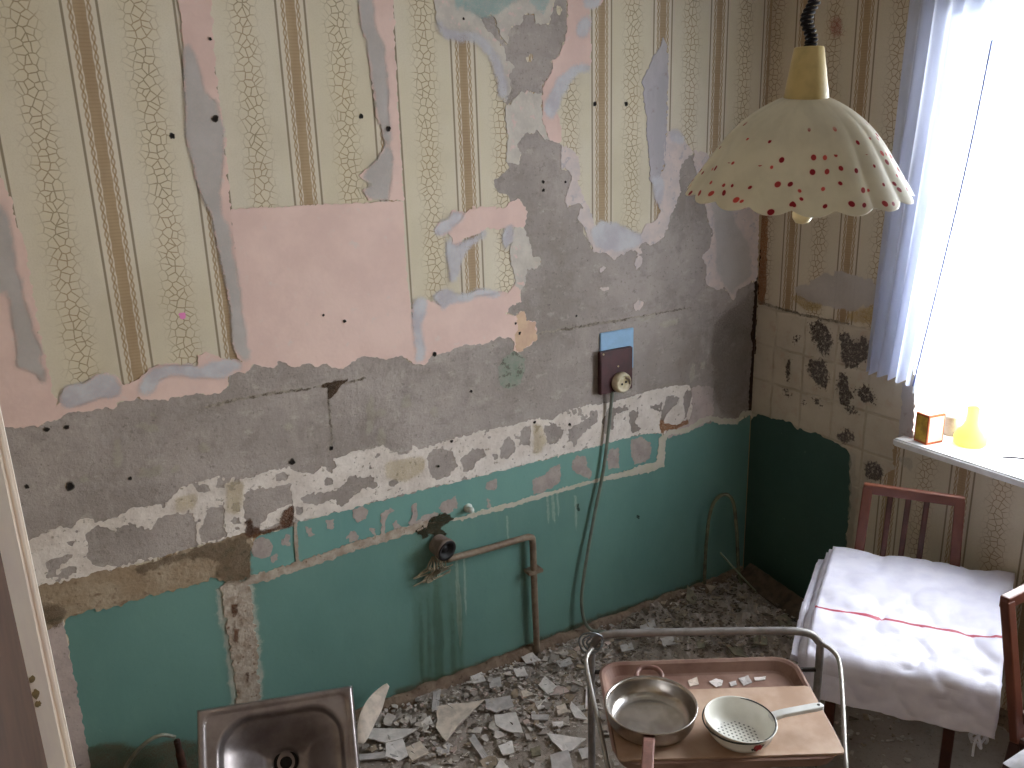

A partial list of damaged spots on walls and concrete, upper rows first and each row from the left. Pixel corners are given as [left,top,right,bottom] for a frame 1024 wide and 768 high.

flaking render [481,0,567,105]
crack [205,376,366,446]
flaking render [5,130,917,768]
leakage [784,295,878,415]